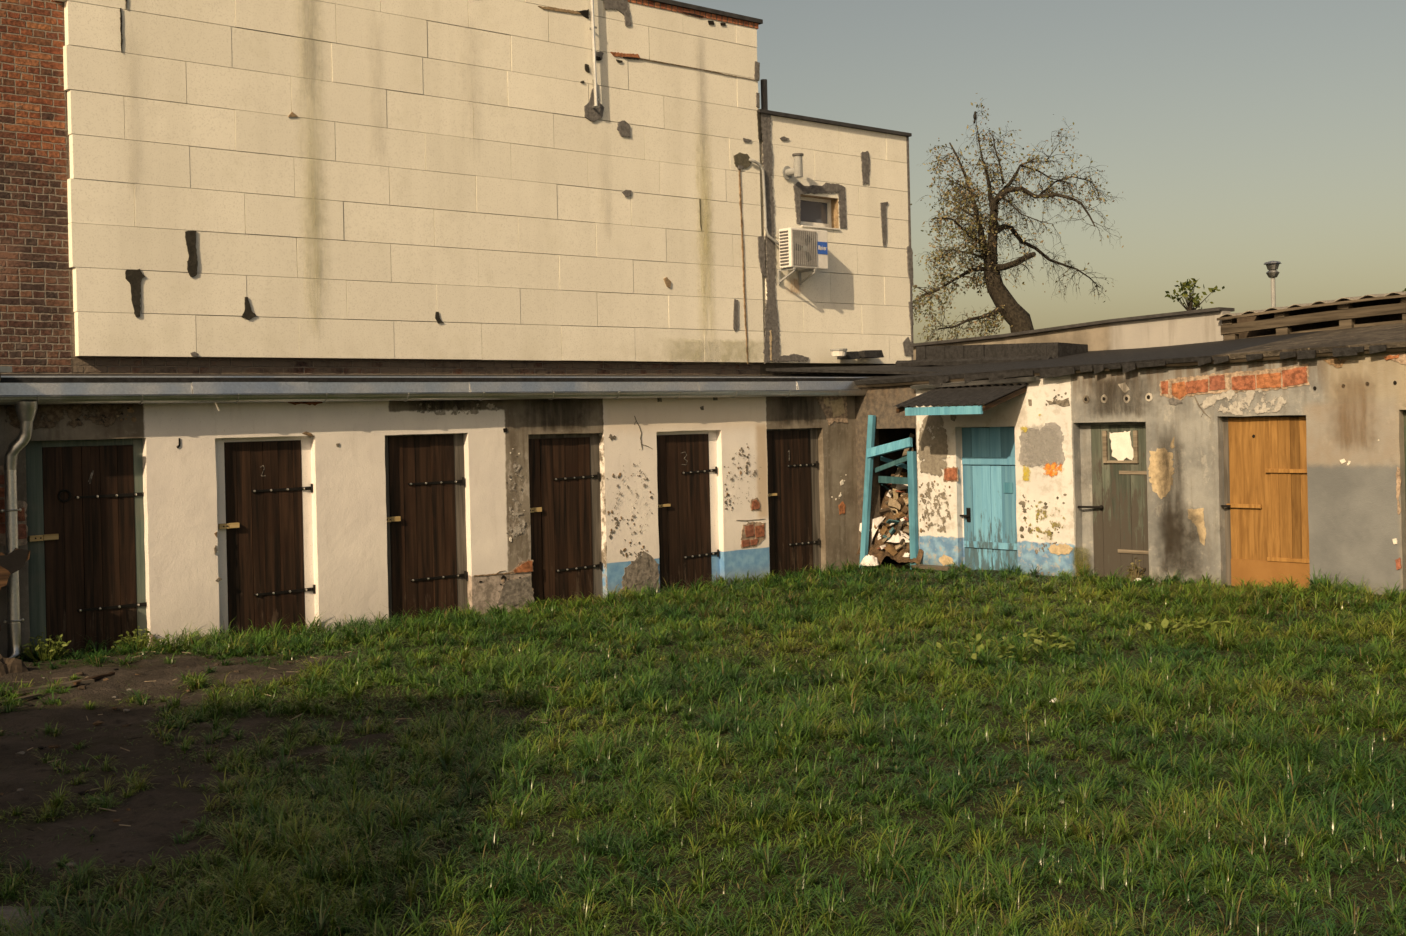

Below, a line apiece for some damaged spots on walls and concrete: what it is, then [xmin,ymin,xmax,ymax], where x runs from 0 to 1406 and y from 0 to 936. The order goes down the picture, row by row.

peeling [1028,390,1105,407]
flaking render [1147,357,1348,416]
flaking render [0,465,28,546]
spalling [607,449,660,598]
flaking render [724,446,765,548]
peeling [917,415,959,533]
peeling [1148,437,1175,499]